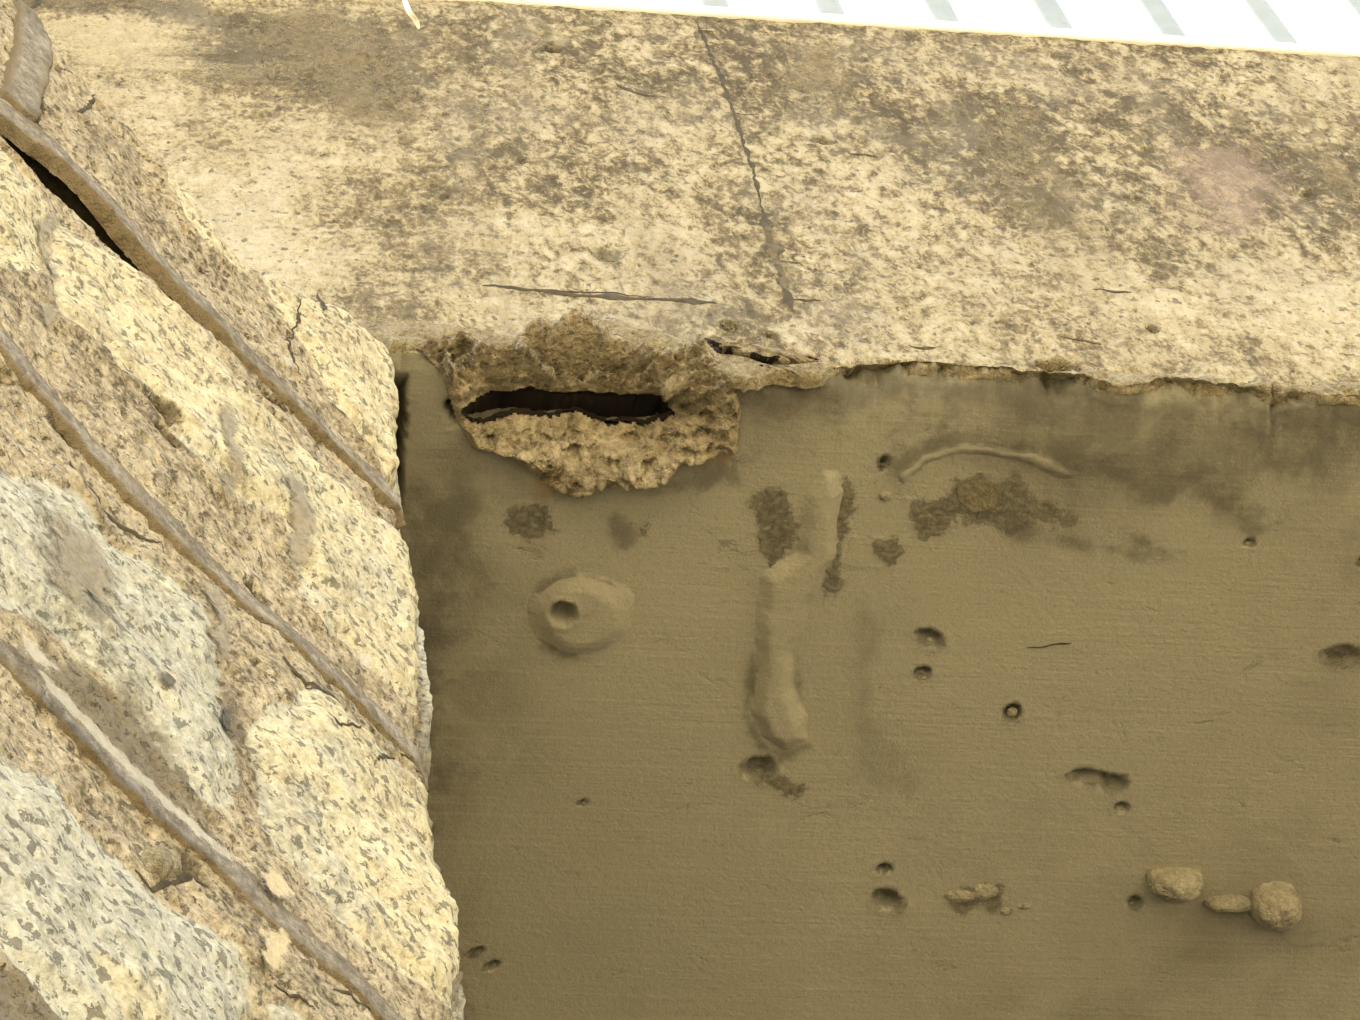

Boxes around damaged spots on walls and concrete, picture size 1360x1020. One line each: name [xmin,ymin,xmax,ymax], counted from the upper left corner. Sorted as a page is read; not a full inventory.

crack [694,19,794,309]
spalling [358,309,847,500]
peeling [504,503,560,544]